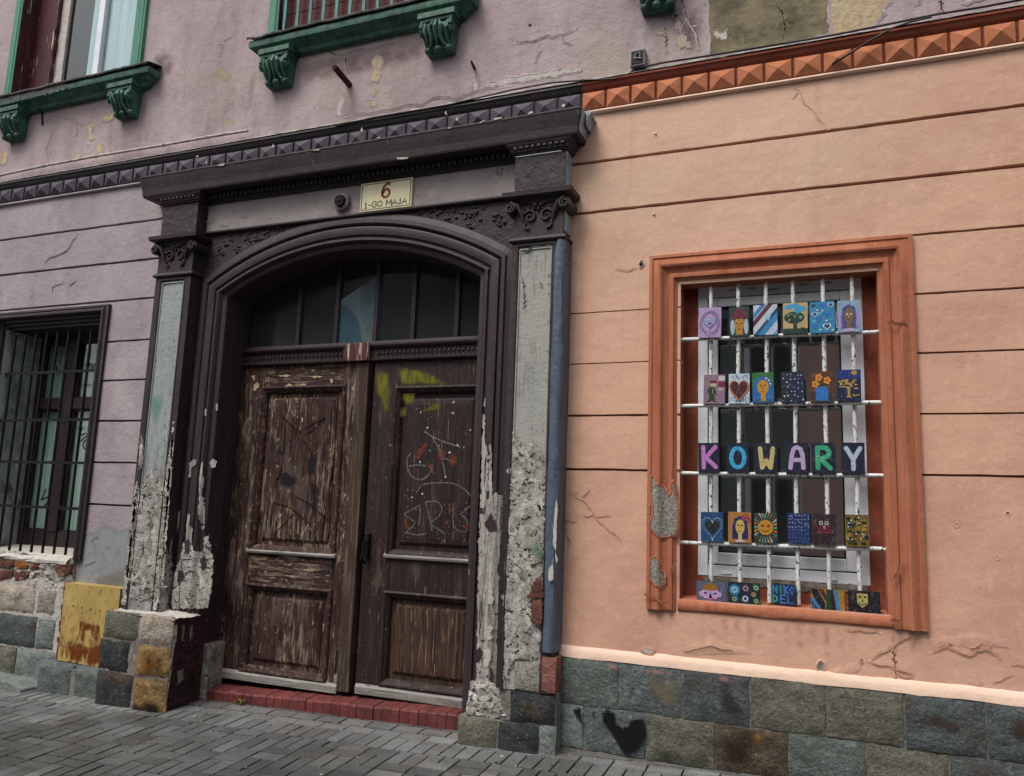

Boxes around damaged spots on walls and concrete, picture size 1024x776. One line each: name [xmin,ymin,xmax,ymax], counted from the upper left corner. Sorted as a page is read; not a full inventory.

flaking render [704,0,893,58]
crack [789,84,829,130]
spalling [121,421,217,612]
spalling [474,398,558,686]
crack [565,487,625,552]
spalling [647,554,667,590]
spalling [647,472,680,540]
corrosion [69,622,100,664]
crack [843,619,1024,687]